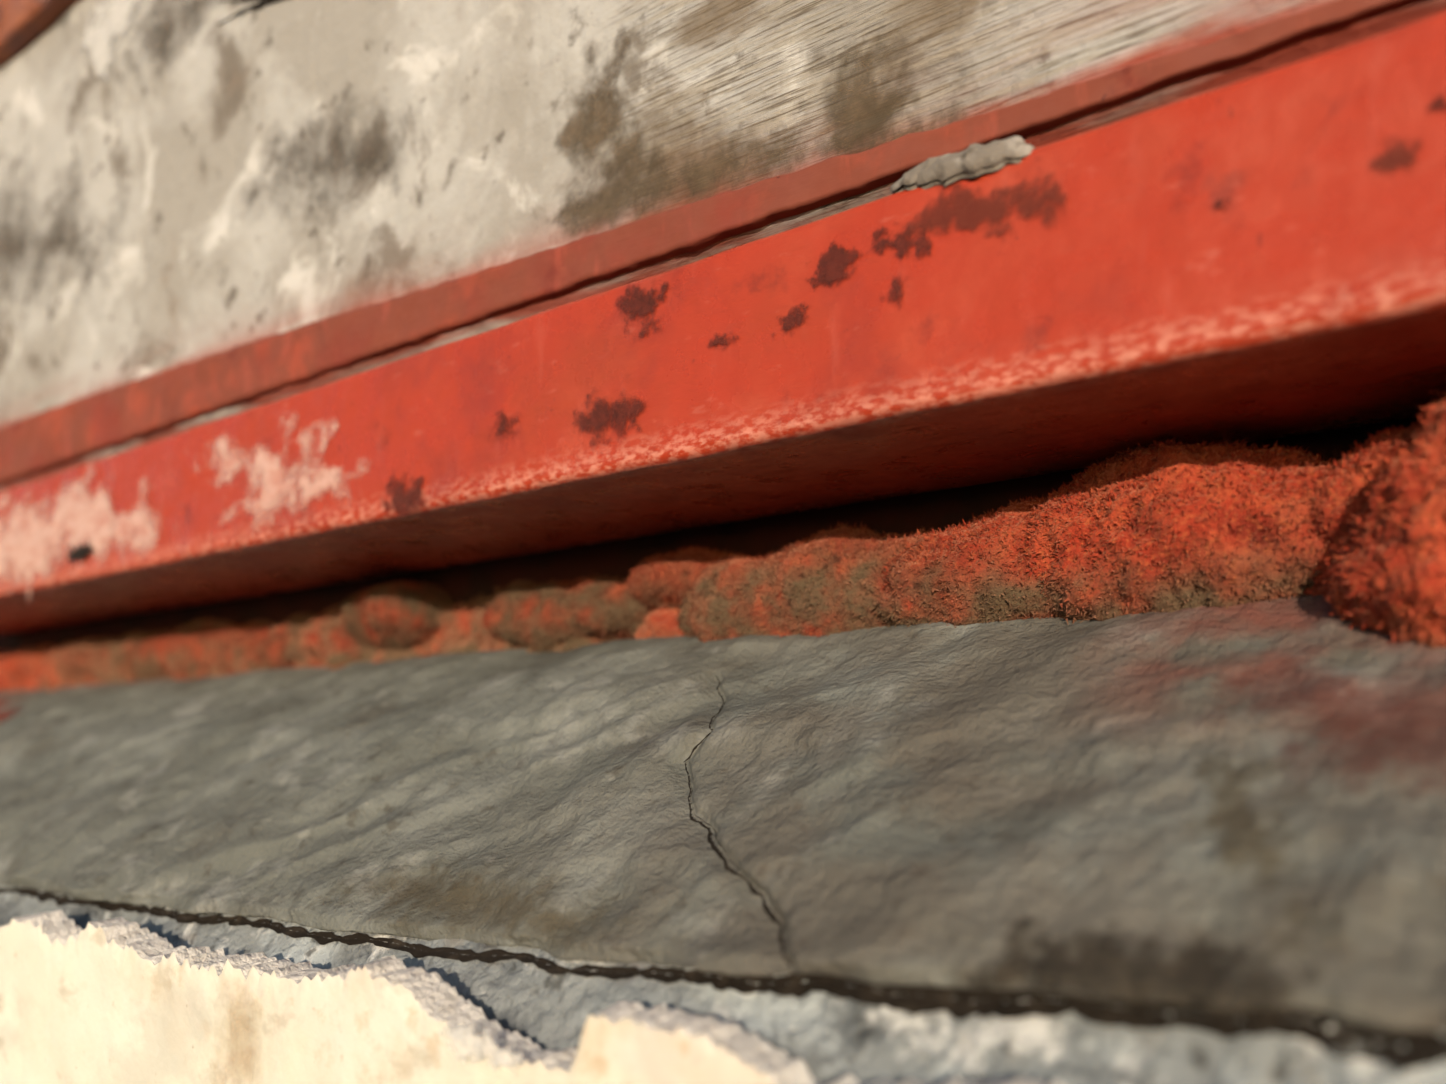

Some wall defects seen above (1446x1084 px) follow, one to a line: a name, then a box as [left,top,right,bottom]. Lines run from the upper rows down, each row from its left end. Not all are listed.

peeling [0,477,157,585]
peeling [216,422,341,522]
crack [0,676,1446,1074]
peeling [0,885,1446,1084]